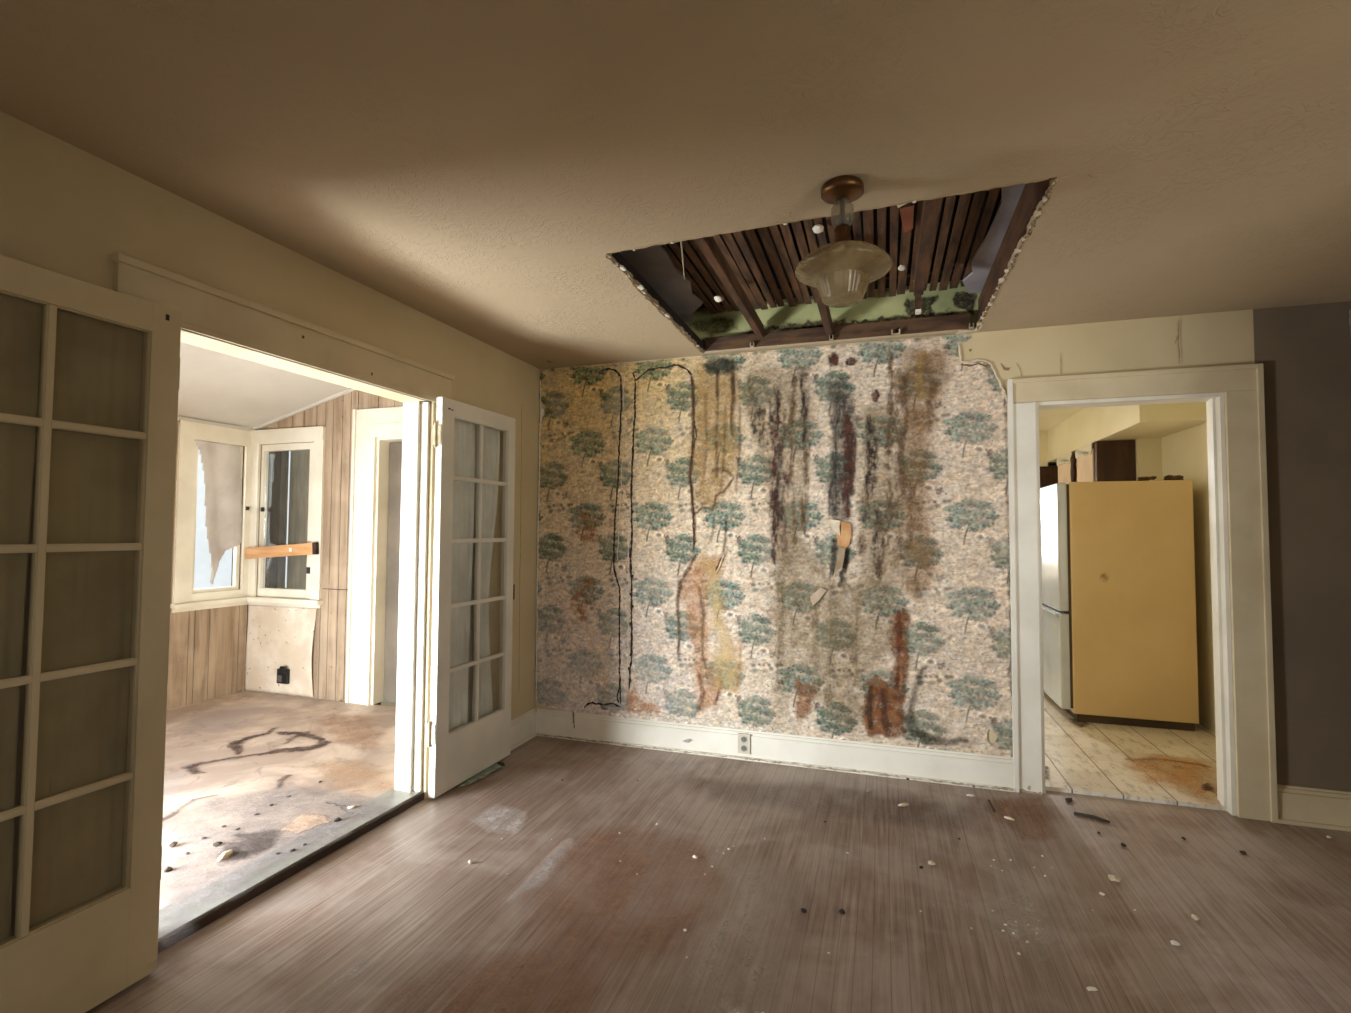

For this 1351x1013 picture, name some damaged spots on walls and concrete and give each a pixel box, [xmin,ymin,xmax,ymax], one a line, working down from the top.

peeling [605,178,1058,353]
damp [676,359,737,710]
damp [753,373,809,564]
damp [828,352,944,595]
damp [908,704,967,745]